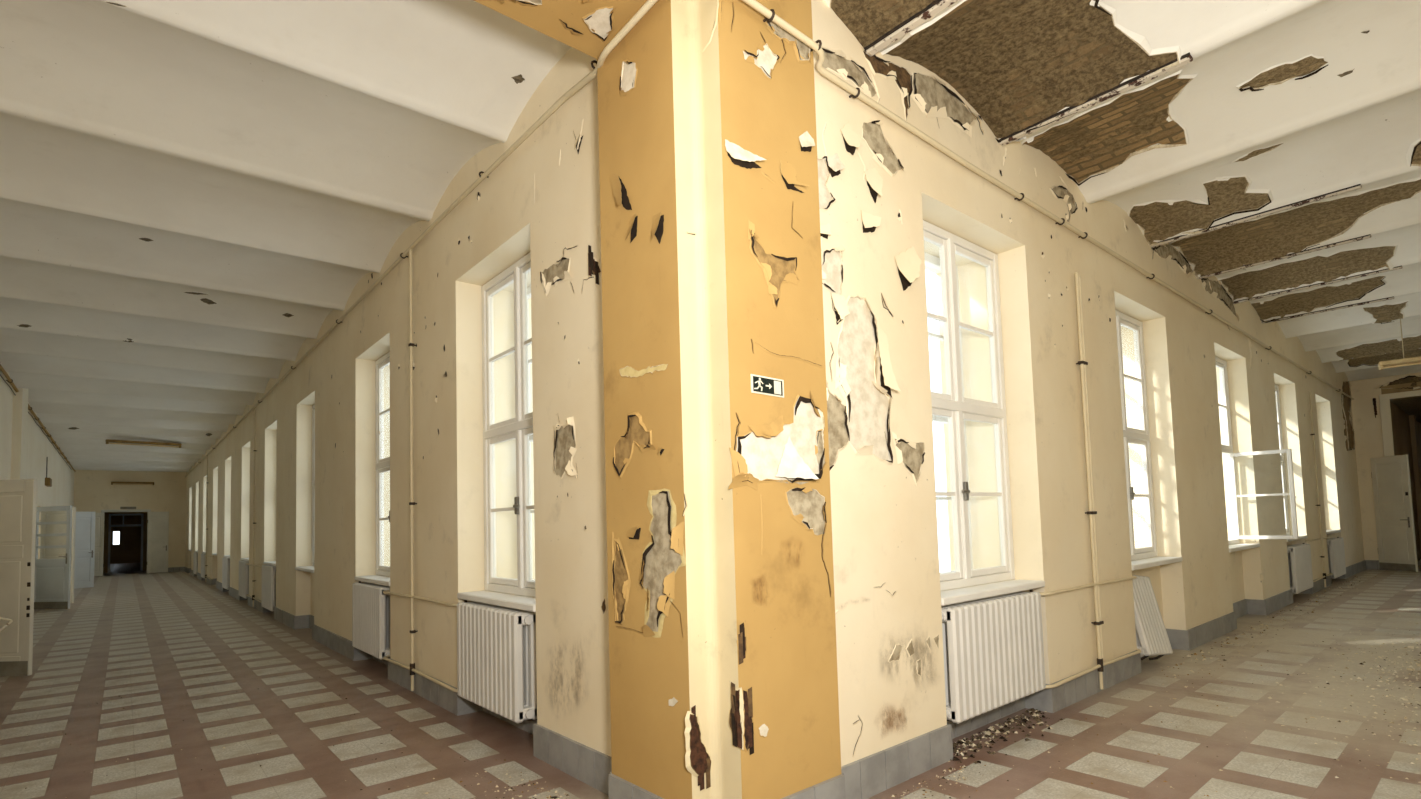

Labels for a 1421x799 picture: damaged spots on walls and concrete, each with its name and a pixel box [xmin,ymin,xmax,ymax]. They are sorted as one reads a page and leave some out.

peeling [582,0,617,41]
peeling [743,21,980,138]
peeling [609,173,664,244]
peeling [1151,243,1264,321]
peeling [725,117,925,536]
peeling [553,417,578,500]
peeling [613,412,664,478]
spalling [1341,381,1355,451]
peeling [601,488,686,638]
spalling [737,623,747,664]
spalling [669,697,712,791]
spalling [729,682,769,755]